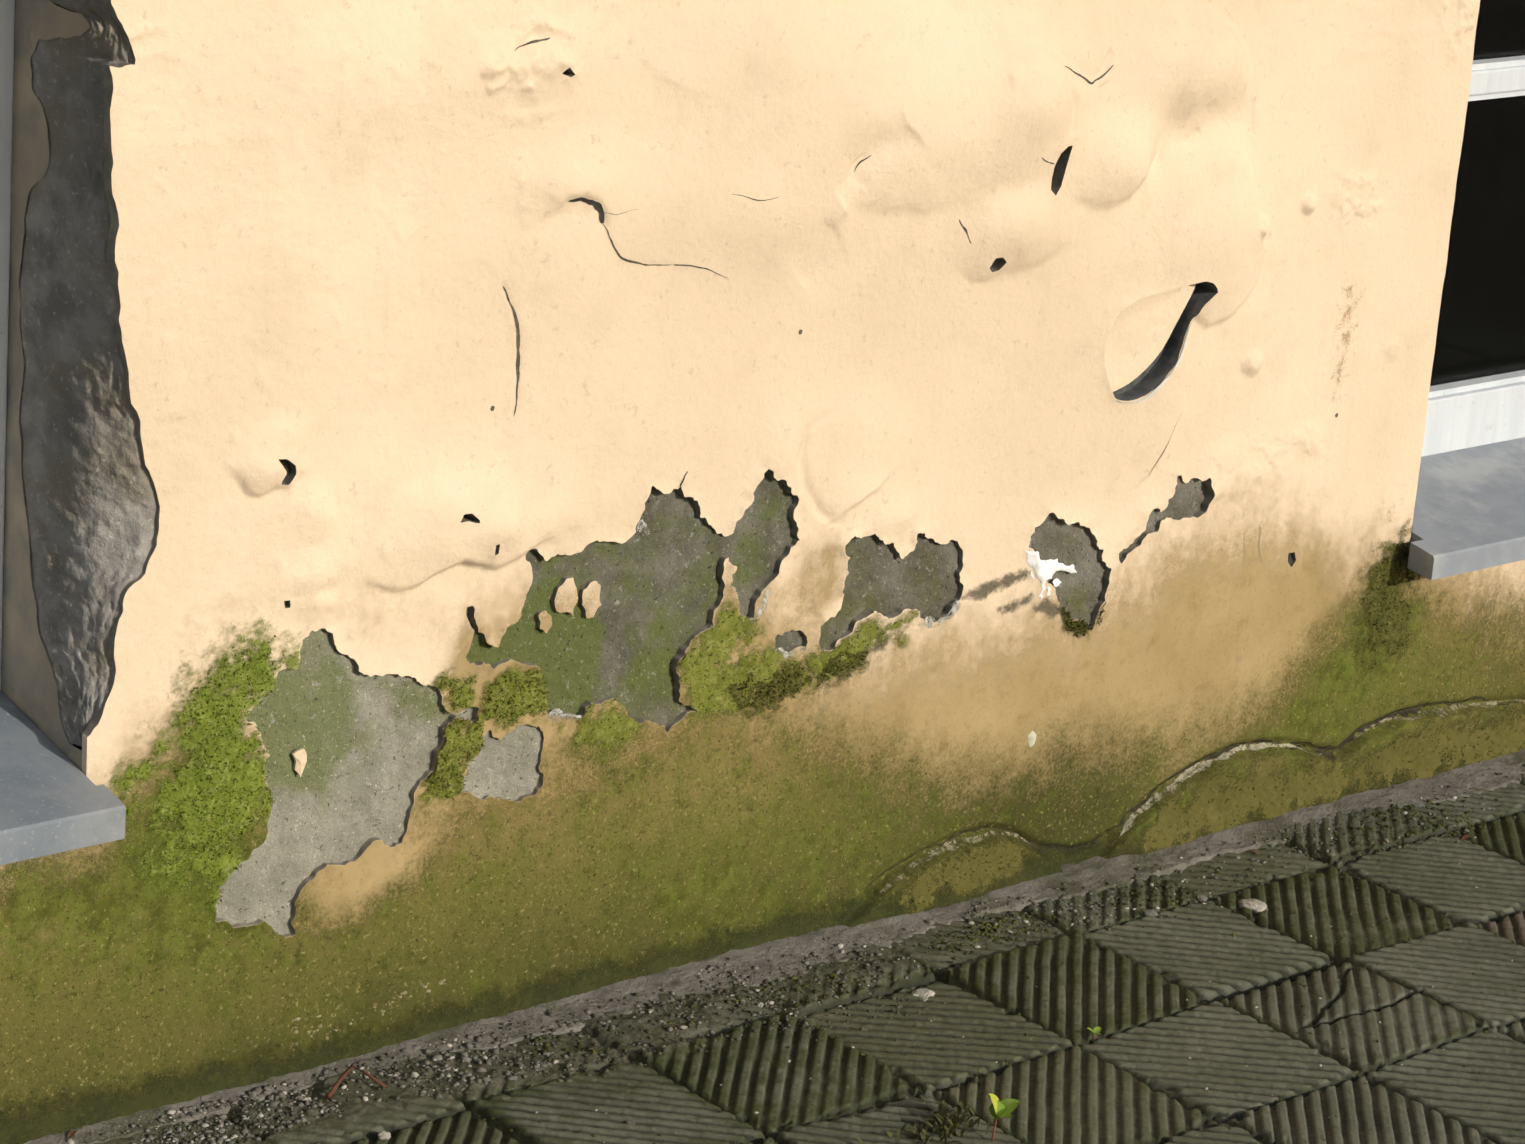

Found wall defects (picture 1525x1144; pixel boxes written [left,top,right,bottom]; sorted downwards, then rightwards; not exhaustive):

crack [569,197,726,278]
flaking render [19,0,160,747]
crack [503,286,520,415]
peeling [775,533,964,659]
peeling [1029,475,1215,631]
leakage [1389,556,1525,671]
leakage [0,722,205,895]
peeling [215,469,799,937]
leakage [286,530,1379,938]
crack [867,696,1525,893]
leakage [1289,758,1465,811]
leakage [0,842,1152,1144]